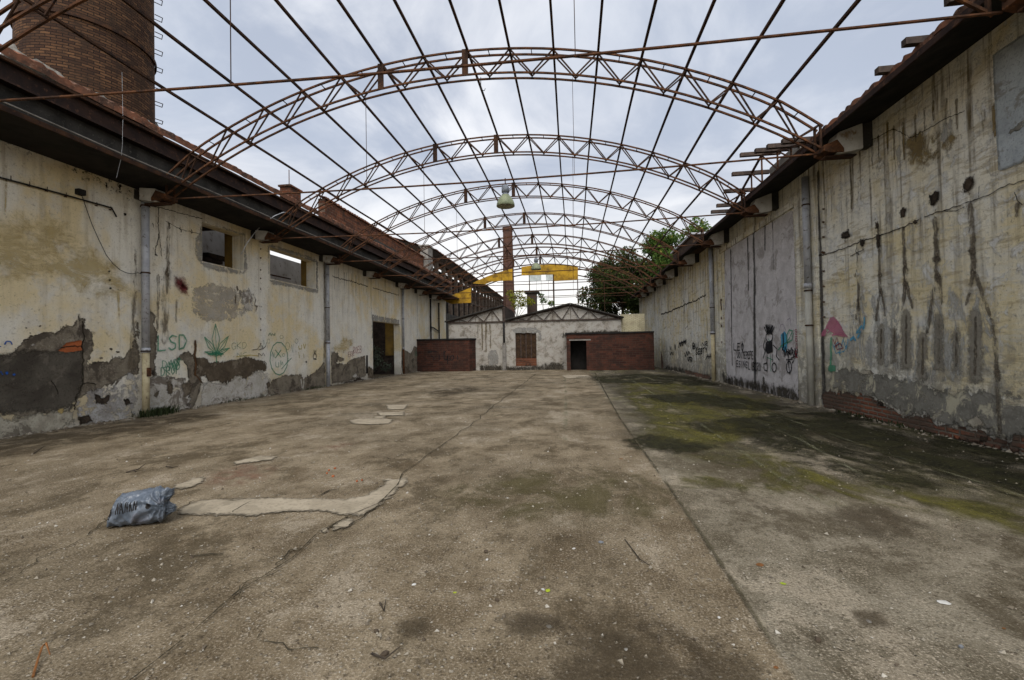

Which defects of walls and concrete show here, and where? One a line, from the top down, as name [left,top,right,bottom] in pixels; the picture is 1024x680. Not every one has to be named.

spalling [841,222,880,252]
crack [819,180,1024,256]
spalling [929,190,939,207]
spalling [962,176,974,195]
leakage [0,226,136,373]
peeling [1,311,373,425]
peeling [192,283,257,321]
leakage [590,171,1024,497]
flaking render [821,389,1024,454]
crack [129,374,535,680]